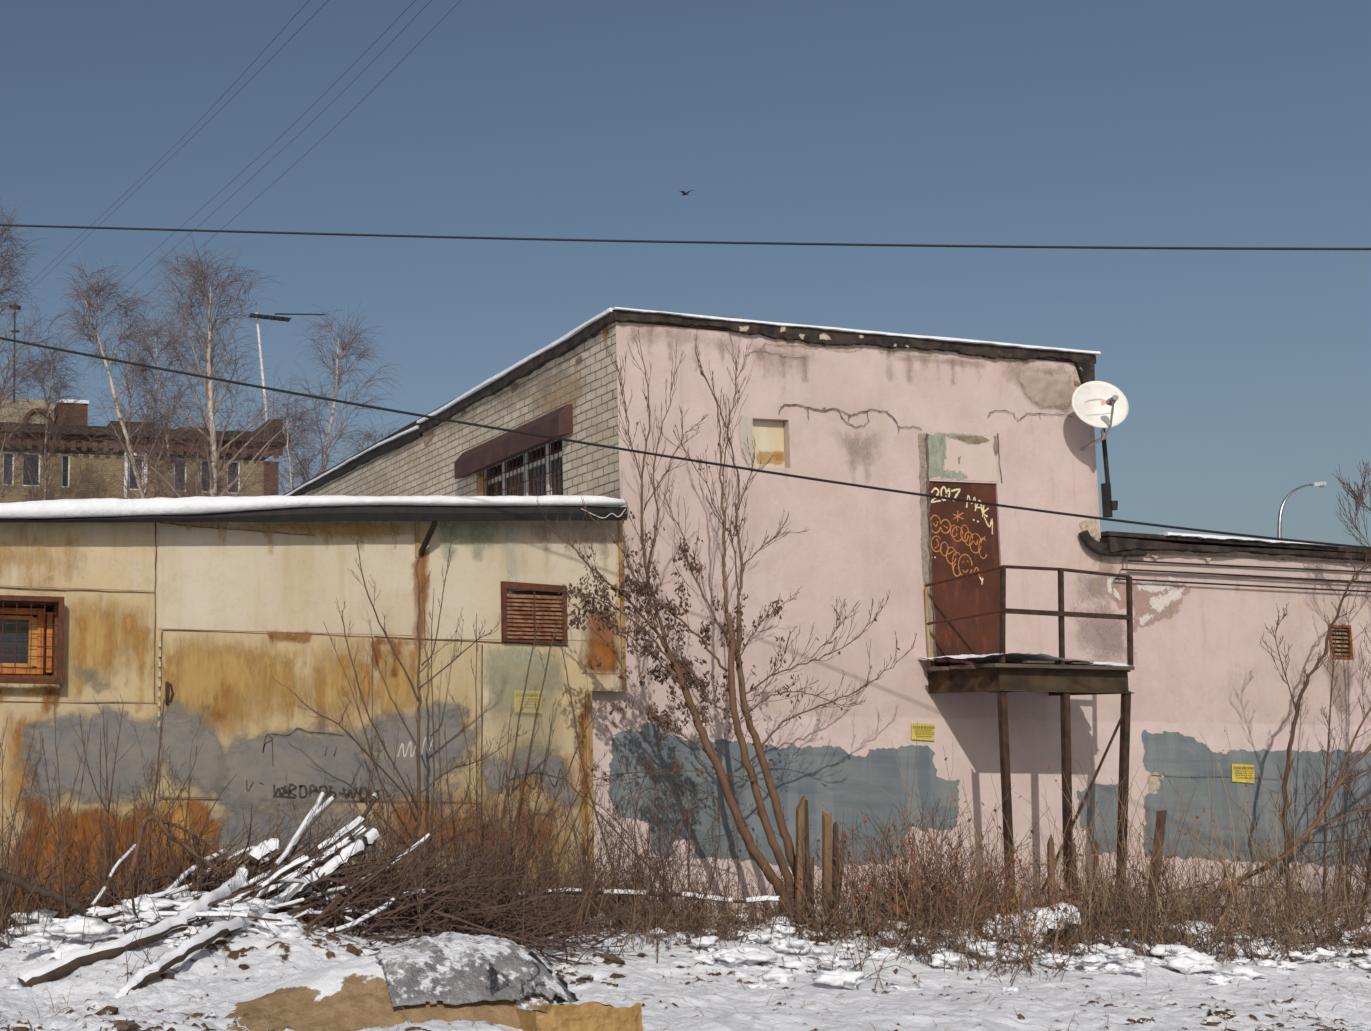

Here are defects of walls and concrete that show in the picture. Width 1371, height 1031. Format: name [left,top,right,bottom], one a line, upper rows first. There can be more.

peeling [926,432,998,482]
crack [988,410,1073,483]
crack [778,404,937,666]
spalling [1147,551,1297,561]
peeling [1107,575,1190,631]
rust [0,602,149,711]
rust [160,552,428,729]
rust [586,612,618,672]
spalling [1148,770,1164,794]
rust [0,722,221,919]